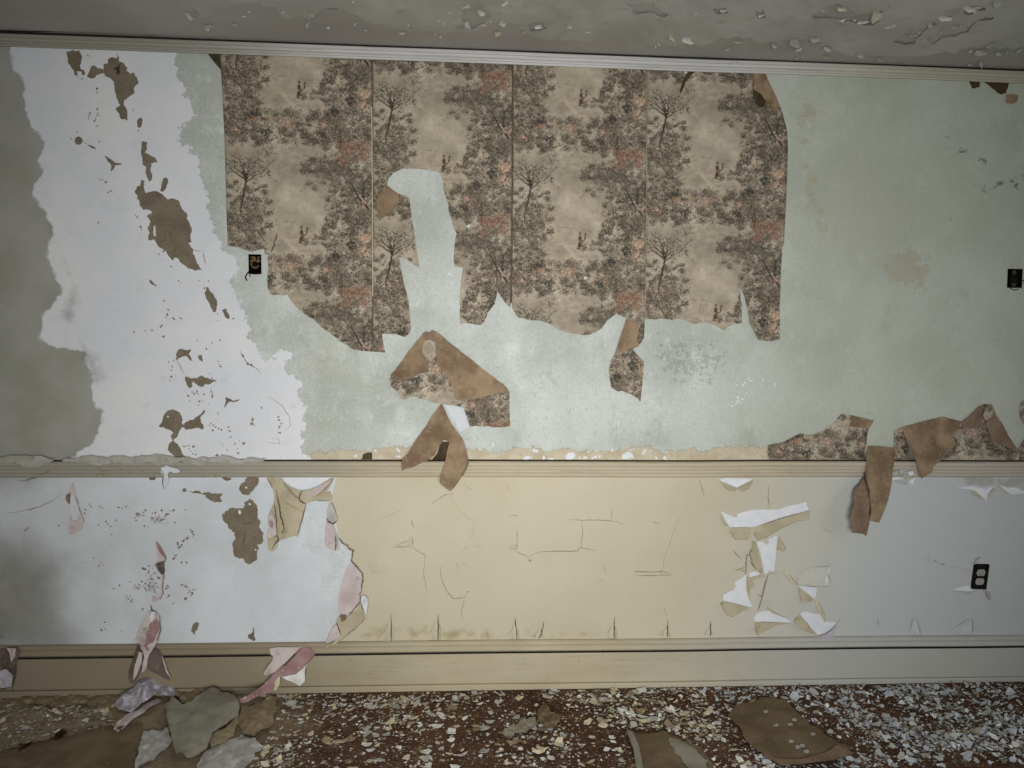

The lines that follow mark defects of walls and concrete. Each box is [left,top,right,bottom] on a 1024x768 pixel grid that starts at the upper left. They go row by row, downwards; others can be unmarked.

peeling [175,0,1024,69]
peeling [0,47,369,648]
peeling [444,404,469,432]
peeling [523,449,667,460]
peeling [719,478,753,492]
peeling [958,484,1024,500]
crack [379,486,481,617]
crack [512,510,619,581]
peeling [721,502,841,640]